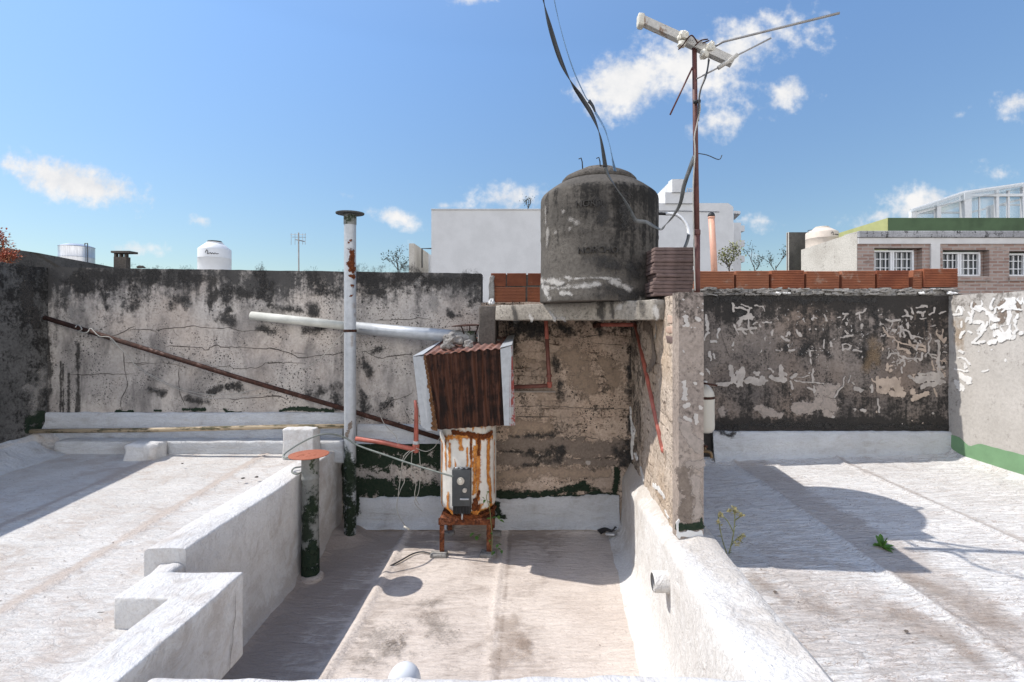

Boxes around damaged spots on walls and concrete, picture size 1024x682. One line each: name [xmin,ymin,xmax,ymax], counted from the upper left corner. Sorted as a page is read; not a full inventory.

rust [346,239,356,297]
leakage [53,266,339,334]
leakage [184,381,244,405]
crack [71,326,410,410]
leakage [305,384,342,411]
leakage [345,390,393,438]
leakage [359,346,382,377]
leakage [496,255,659,488]
flaking render [666,297,1024,425]